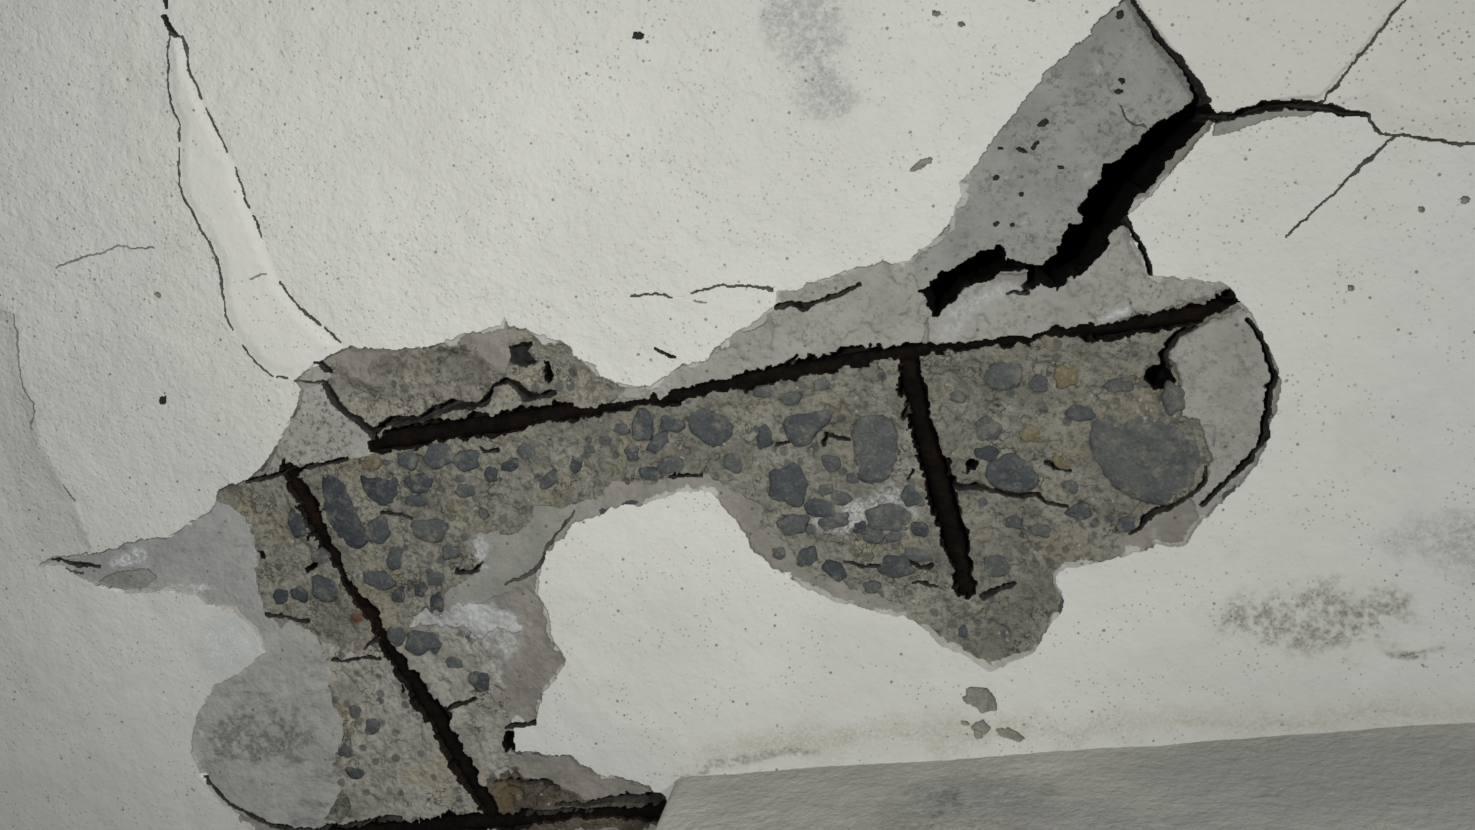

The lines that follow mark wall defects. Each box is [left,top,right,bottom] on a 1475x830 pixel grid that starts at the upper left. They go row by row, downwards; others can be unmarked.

spalling [1128,108,1316,214]
crack [1099,0,1475,238]
crack [161,0,557,484]
crack [630,282,862,312]
peeling [322,0,1193,439]
crack [1121,216,1153,276]
crack [1128,317,1279,535]
peeling [1268,350,1282,424]
crack [504,510,575,585]
spalling [37,226,1270,830]
crack [949,476,1069,509]
crack [203,775,403,830]